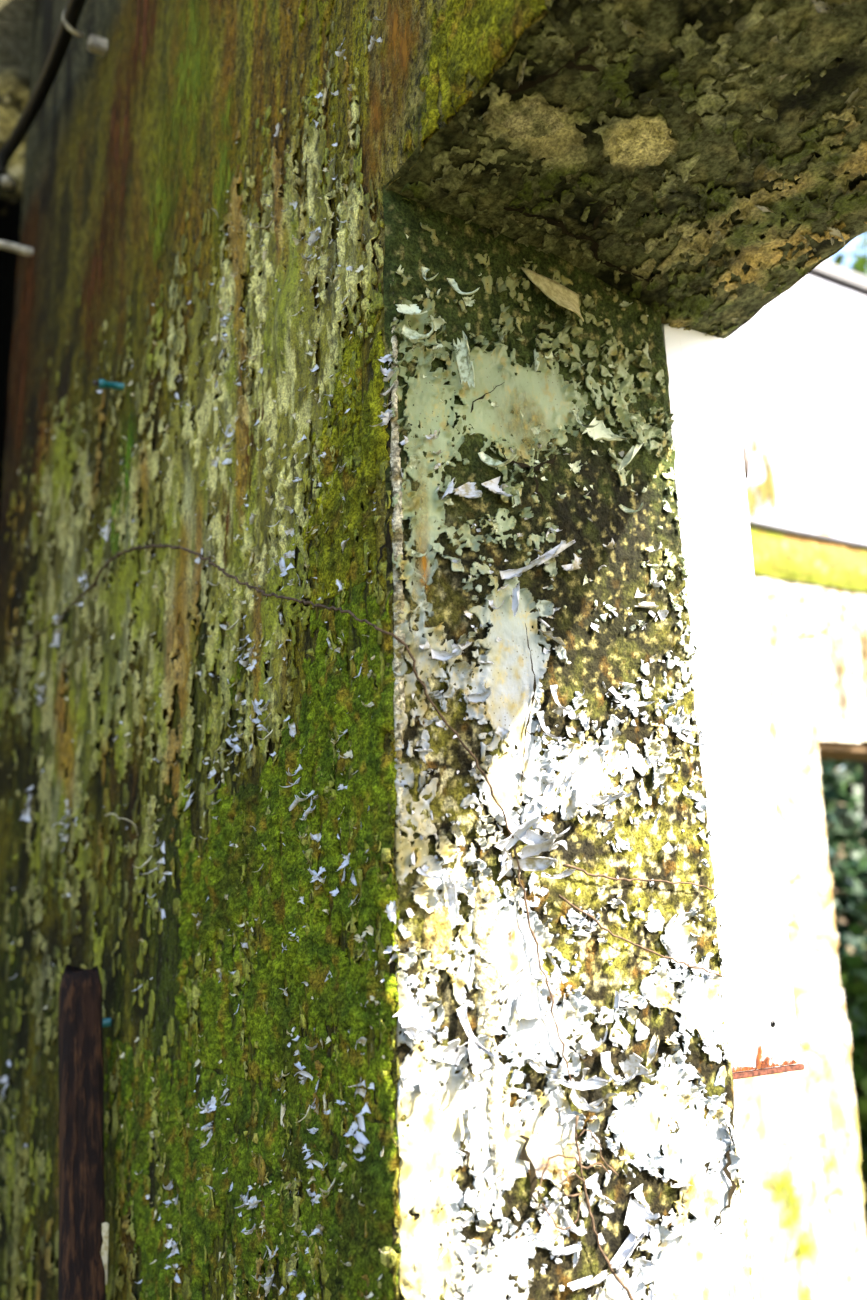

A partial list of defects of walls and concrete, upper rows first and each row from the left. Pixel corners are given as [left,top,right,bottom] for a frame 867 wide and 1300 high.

flaking render [615,99,674,164]
damp [223,497,232,564]
peeling [102,38,372,942]
damp [246,400,263,494]
peeling [12,500,166,706]
peeling [19,768,45,826]
peeling [43,792,89,903]
peeling [197,220,743,1300]
peeling [0,1059,11,1103]
peeling [186,1035,230,1148]
corrosion [731,1044,799,1073]
peeling [135,1156,182,1284]